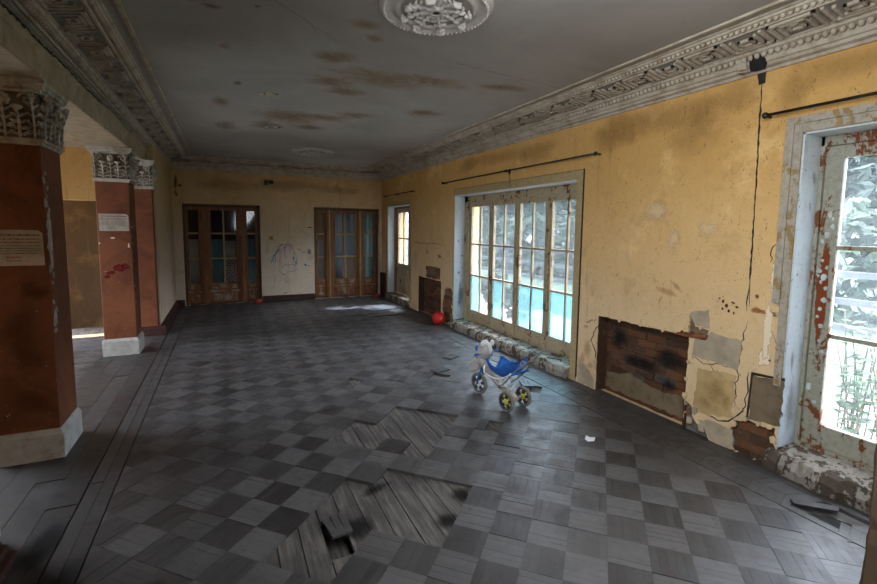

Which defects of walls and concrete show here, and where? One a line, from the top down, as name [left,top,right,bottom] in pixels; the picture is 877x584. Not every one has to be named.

peeling [809,211,835,353]
flaking render [595,316,708,438]
flaking render [731,416,782,462]